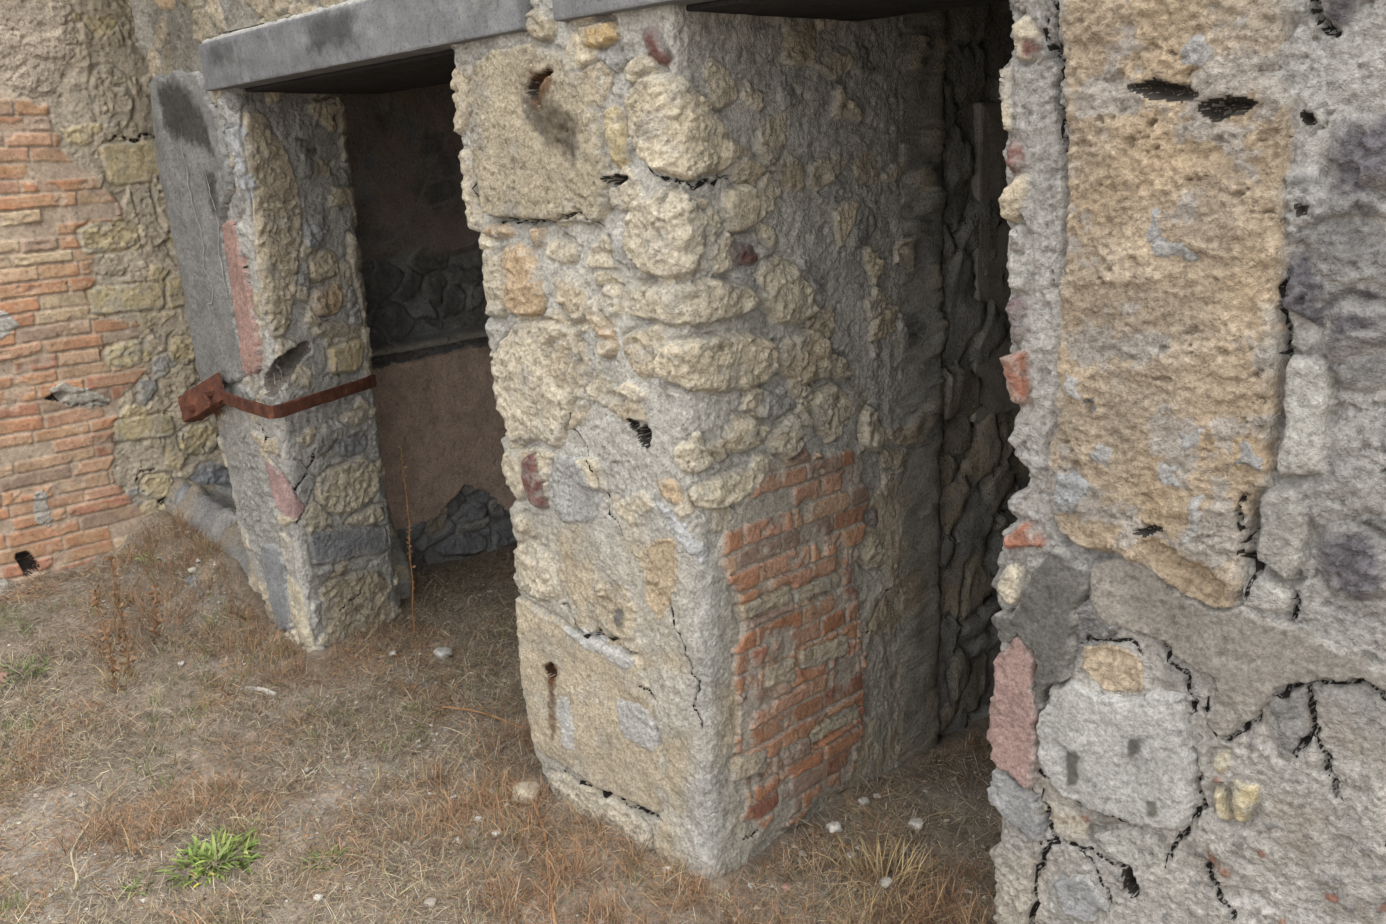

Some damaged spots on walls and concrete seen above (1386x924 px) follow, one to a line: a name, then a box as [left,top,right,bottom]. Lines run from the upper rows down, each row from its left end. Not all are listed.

crack [564,770,663,821]
crack [1029,635,1386,924]